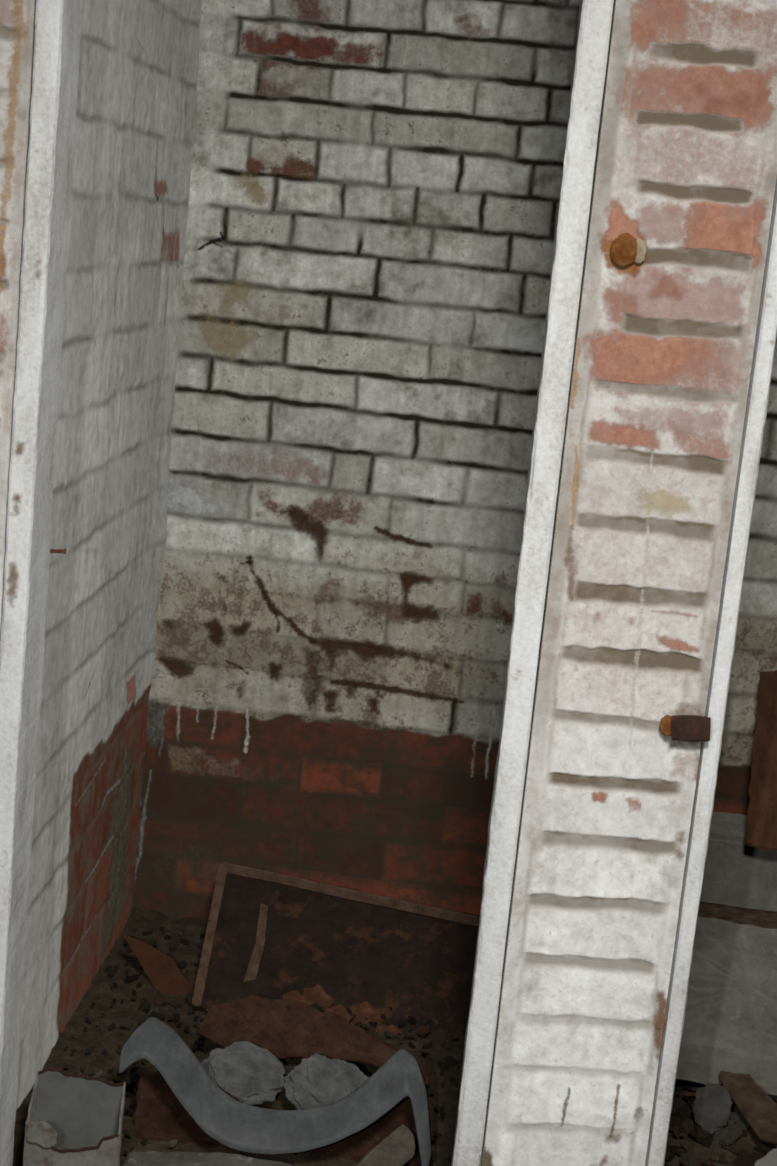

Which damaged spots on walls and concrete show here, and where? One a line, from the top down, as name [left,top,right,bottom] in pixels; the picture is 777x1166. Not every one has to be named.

peeling [631,0,777,50]
peeling [622,65,777,134]
rust [602,233,641,275]
peeling [606,200,766,267]
peeling [587,267,744,391]
peeling [590,410,728,459]
leakage [374,526,432,548]
crack [240,556,315,643]
leakage [304,651,336,705]